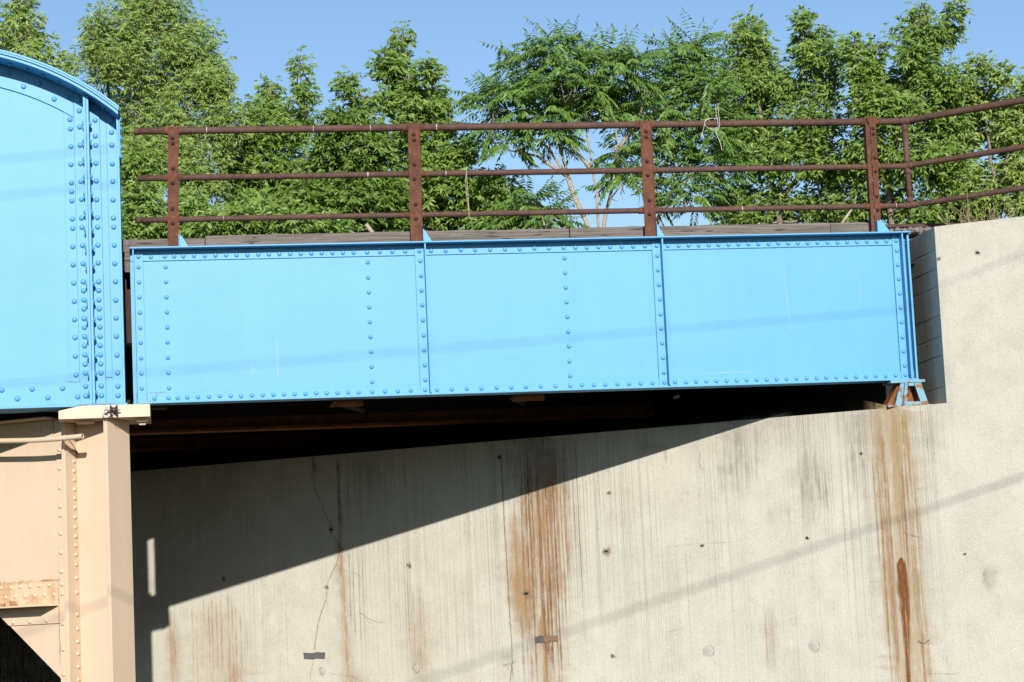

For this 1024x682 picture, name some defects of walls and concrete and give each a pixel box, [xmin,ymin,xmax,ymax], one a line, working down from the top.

rust [511,472,568,666]
rust [881,493,926,682]